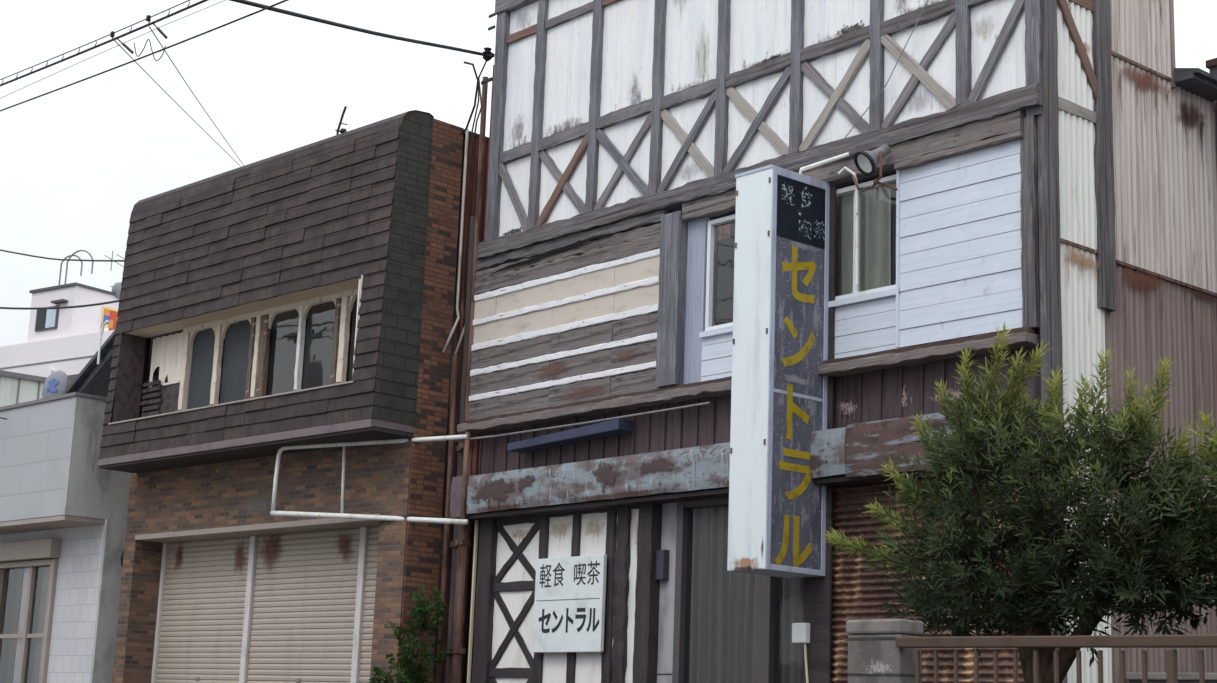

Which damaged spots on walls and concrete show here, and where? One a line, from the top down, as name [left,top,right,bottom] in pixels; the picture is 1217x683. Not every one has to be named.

corrosion [1119,67,1204,146]
peeling [472,475,534,503]
peeling [592,461,620,494]
peeling [636,456,674,474]
peeling [809,455,828,470]
corrosion [235,547,244,567]
corrosion [262,537,278,565]
corrosion [339,537,350,557]